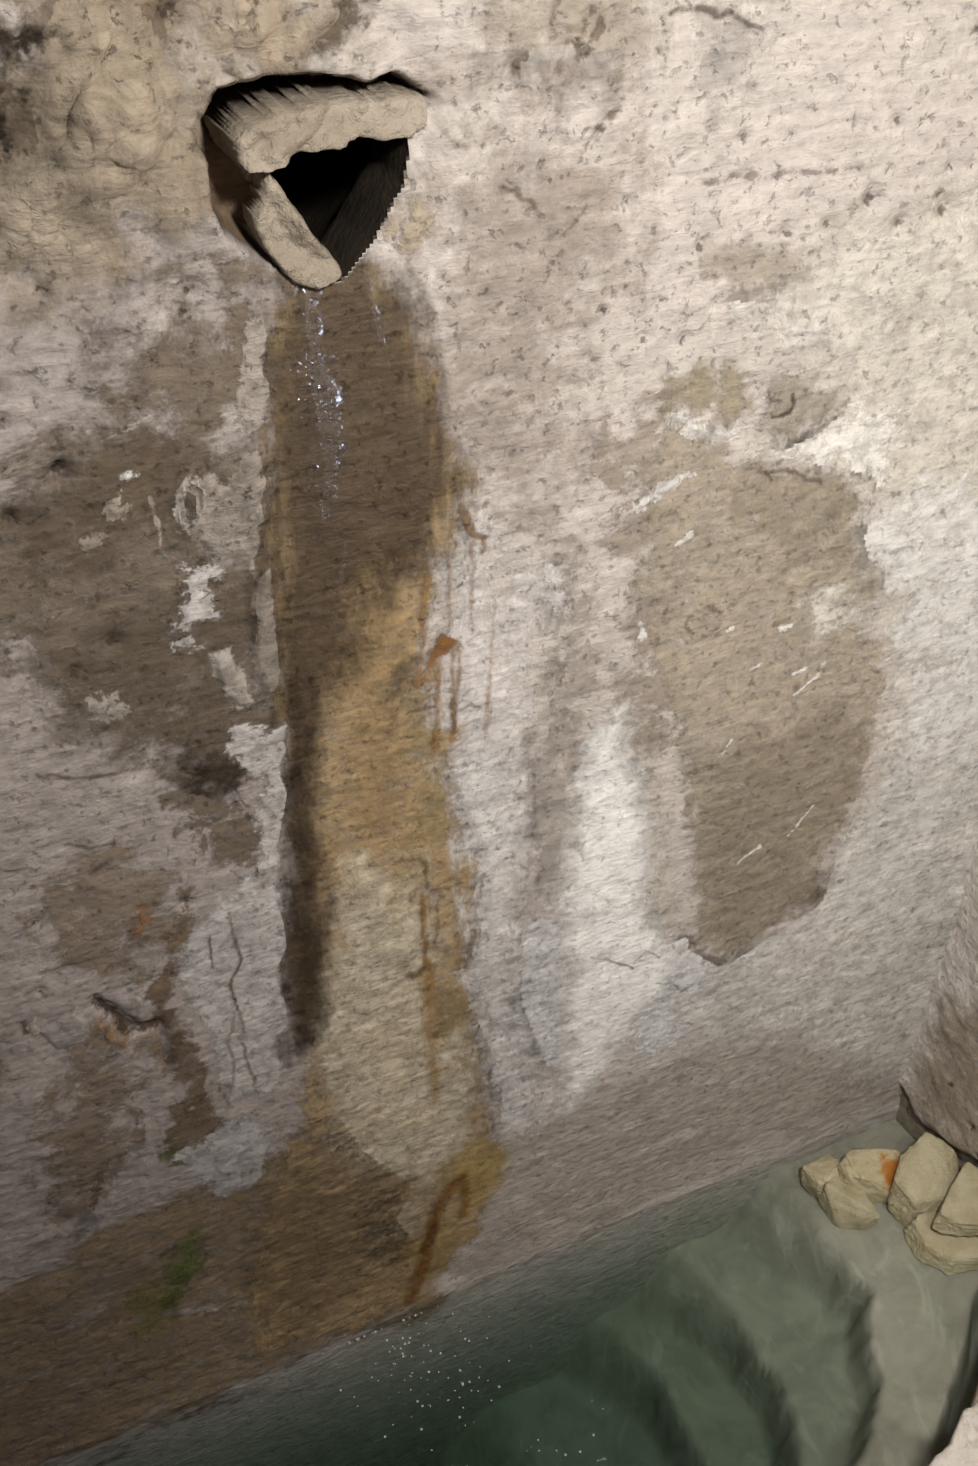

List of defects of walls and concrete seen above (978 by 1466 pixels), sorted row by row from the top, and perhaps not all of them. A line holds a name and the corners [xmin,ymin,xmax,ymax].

water stain [0,42,88,194]
water stain [22,0,199,74]
water stain [487,0,643,89]
water stain [730,300,773,335]
corrosion [415,505,486,756]
water stain [541,639,604,697]
water stain [896,1000,978,1172]
corrosion [407,1144,505,1304]